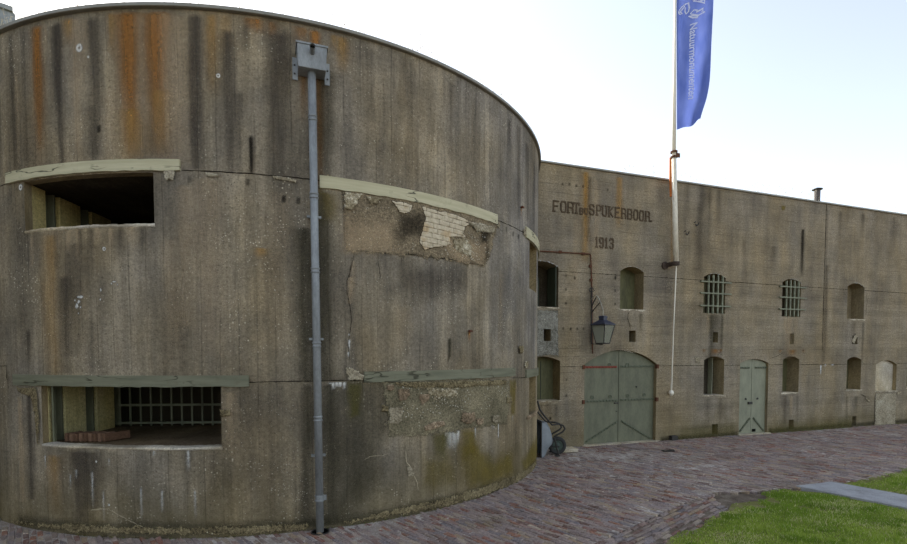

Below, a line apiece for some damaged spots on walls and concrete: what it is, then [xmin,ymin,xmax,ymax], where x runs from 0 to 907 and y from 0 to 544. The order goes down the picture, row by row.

water stain [191,16,201,131]
flaking render [344,192,495,259]
crack [344,209,483,359]
spalling [389,406,403,424]